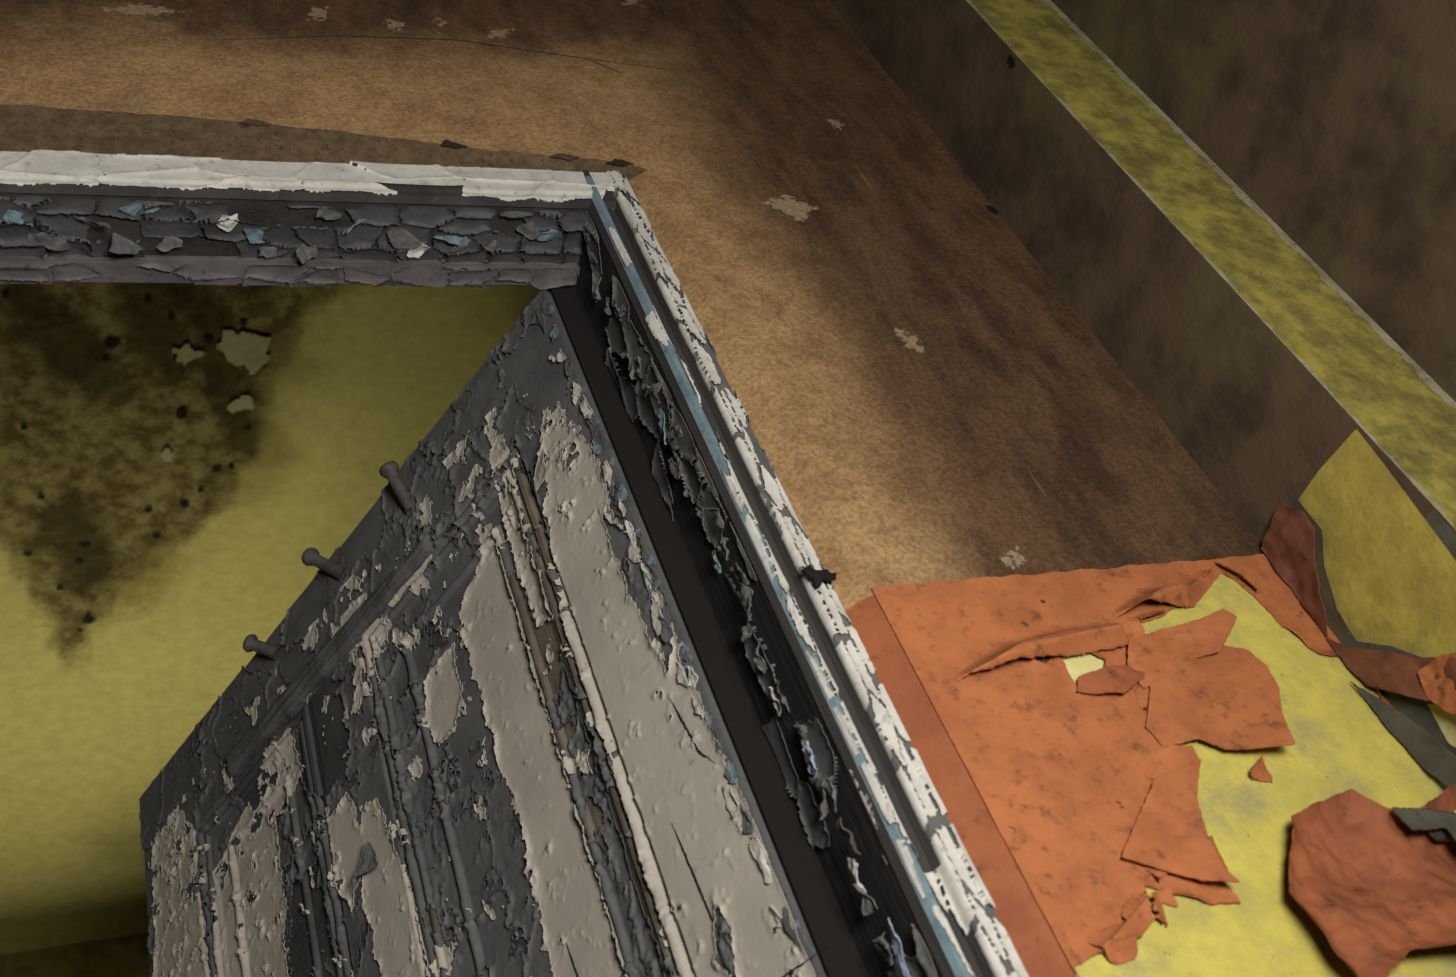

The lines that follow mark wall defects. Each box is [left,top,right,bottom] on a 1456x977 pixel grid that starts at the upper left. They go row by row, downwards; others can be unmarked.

peeling [3,210,71,251]
peeling [73,215,183,255]
peeling [216,214,277,258]
peeling [386,227,498,258]
peeling [584,233,626,317]
peeling [172,330,271,375]
peeling [227,395,254,415]
damp [0,283,338,659]
peeling [534,432,547,491]
peeling [550,324,663,636]
peeling [621,351,911,977]
peeling [956,430,1456,977]